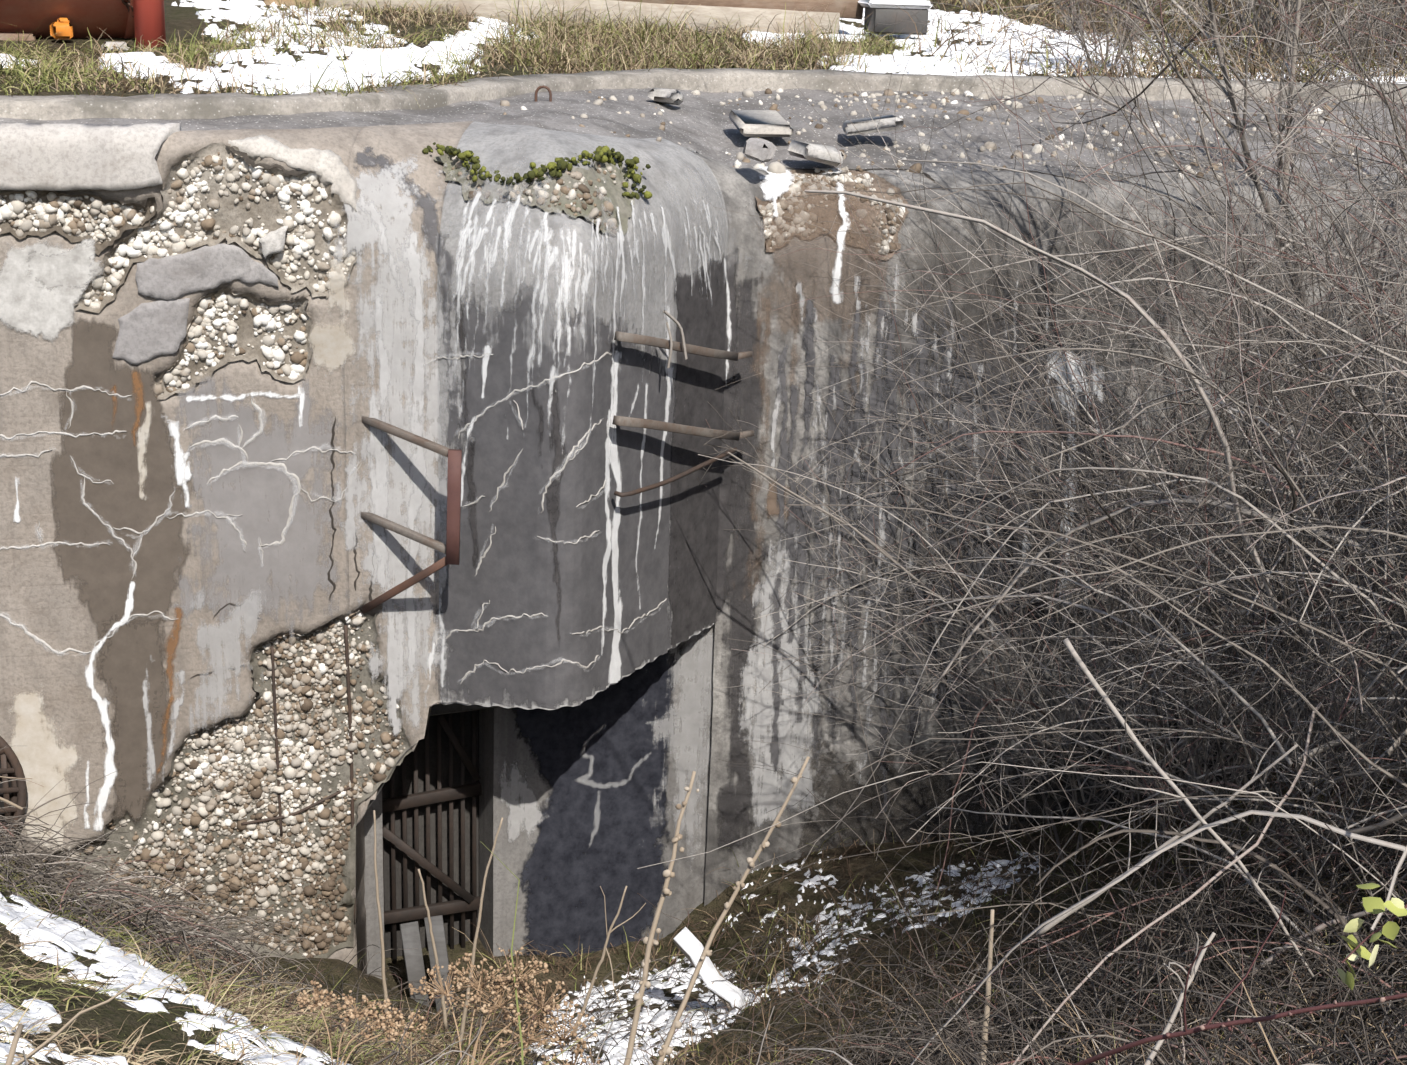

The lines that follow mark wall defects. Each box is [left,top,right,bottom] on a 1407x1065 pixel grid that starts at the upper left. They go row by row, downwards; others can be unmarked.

spalling [0,135,362,400]
spalling [434,154,634,236]
spalling [755,170,909,261]
crack [0,611,179,655]
crack [0,381,375,601]
crack [213,603,261,619]
crack [425,351,666,684]
water stain [10,147,1127,851]
spalling [43,610,414,959]